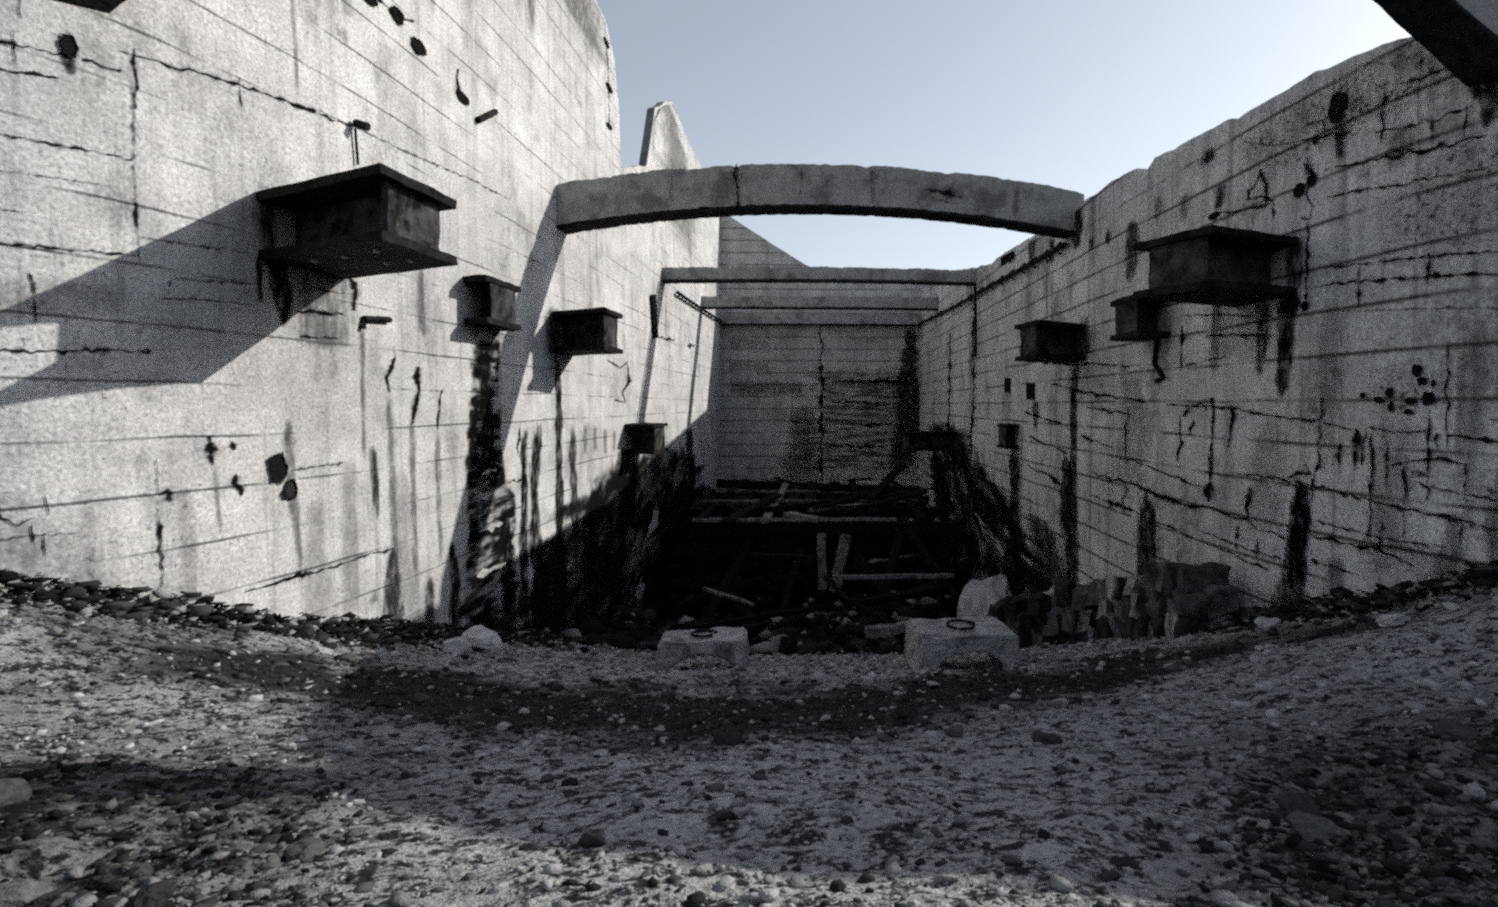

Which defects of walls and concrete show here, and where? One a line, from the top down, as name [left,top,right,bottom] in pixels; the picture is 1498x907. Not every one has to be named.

damp [495,450,711,634]
damp [733,328,1064,596]